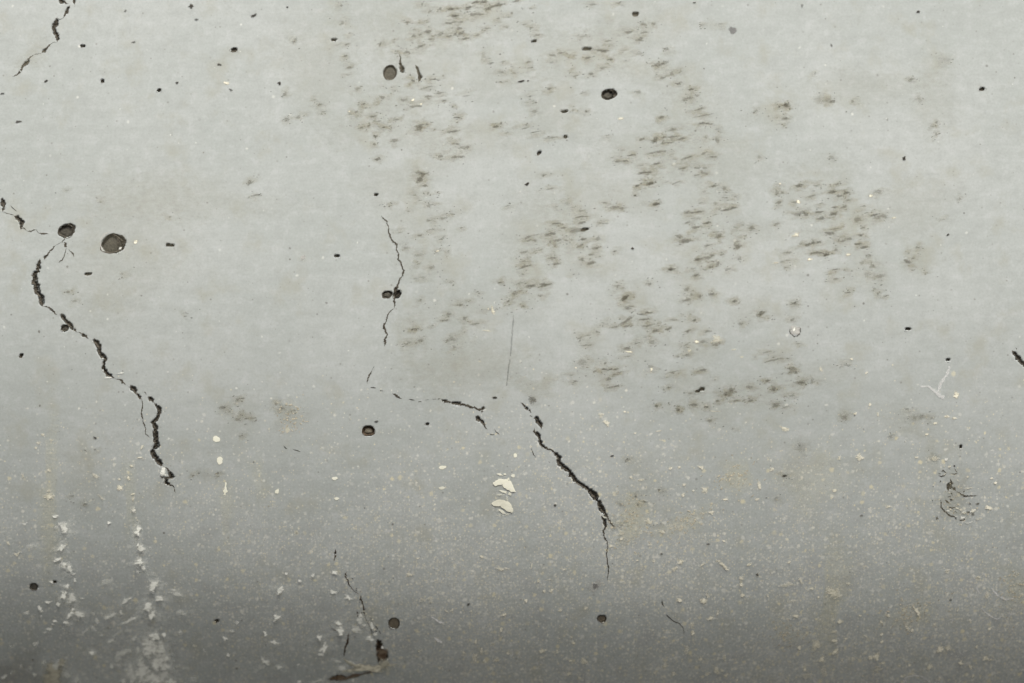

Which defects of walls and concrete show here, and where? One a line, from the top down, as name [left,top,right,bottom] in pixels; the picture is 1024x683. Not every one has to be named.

crack [14,0,75,76]
crack [0,198,175,491]
crack [367,217,499,435]
crack [522,403,614,581]
crack [331,550,381,655]